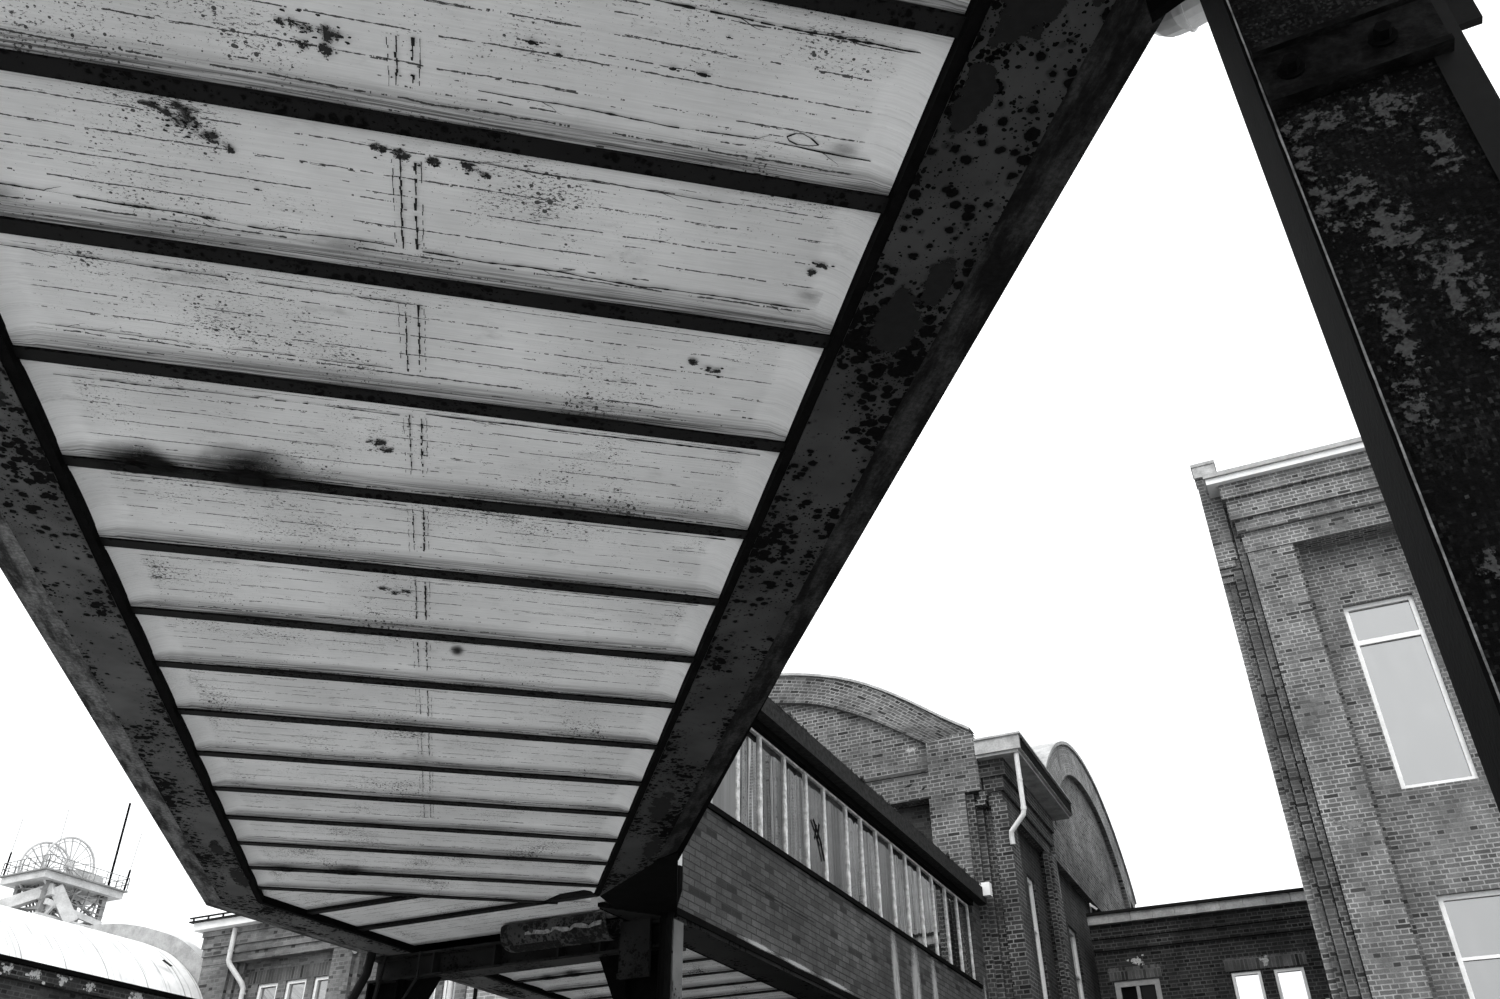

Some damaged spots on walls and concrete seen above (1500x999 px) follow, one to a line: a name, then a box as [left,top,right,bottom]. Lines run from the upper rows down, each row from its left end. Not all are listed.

rust [949,0,1069,139]
water stain [123,454,178,474]
water stain [236,471,323,490]
rust [208,840,250,888]